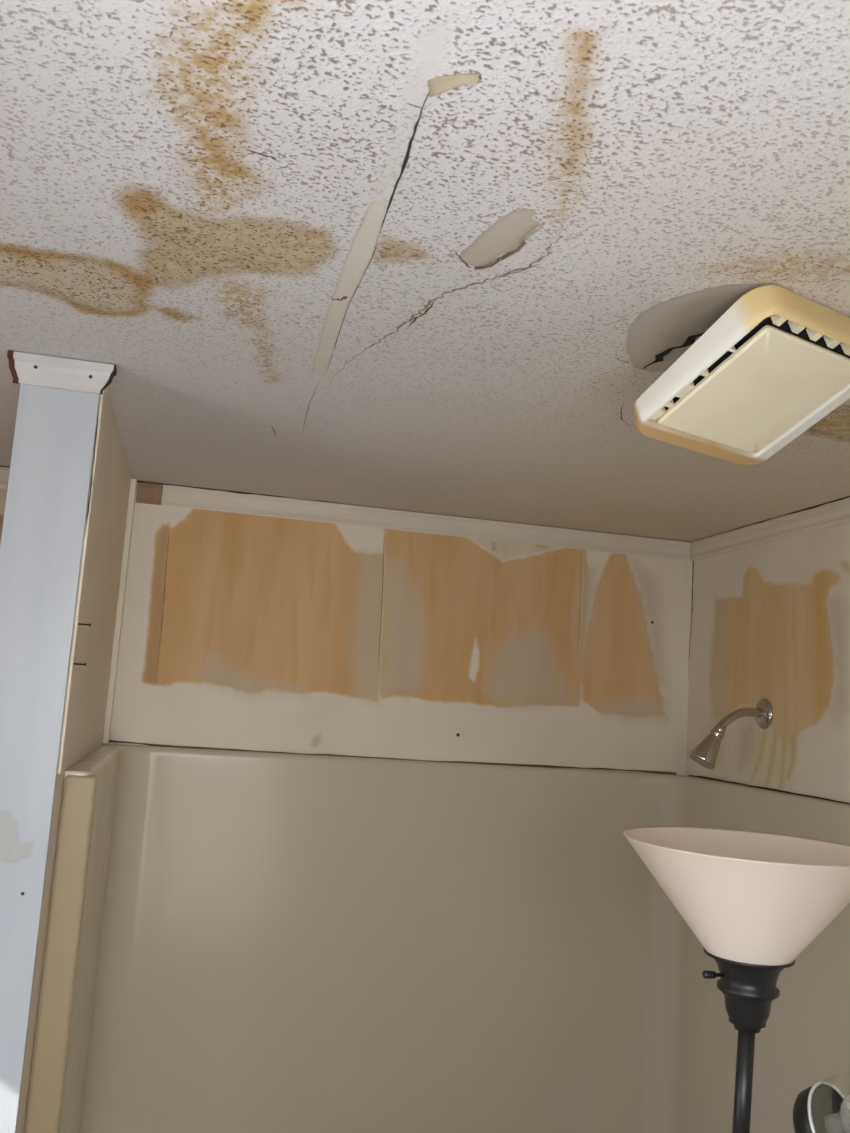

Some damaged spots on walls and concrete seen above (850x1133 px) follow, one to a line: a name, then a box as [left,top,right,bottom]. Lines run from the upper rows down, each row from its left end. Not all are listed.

damp [526,7,625,231]
damp [0,0,348,387]
damp [374,231,440,270]
crack [330,221,564,381]
peeling [450,205,548,271]
peeling [608,273,817,377]
damp [798,398,850,446]